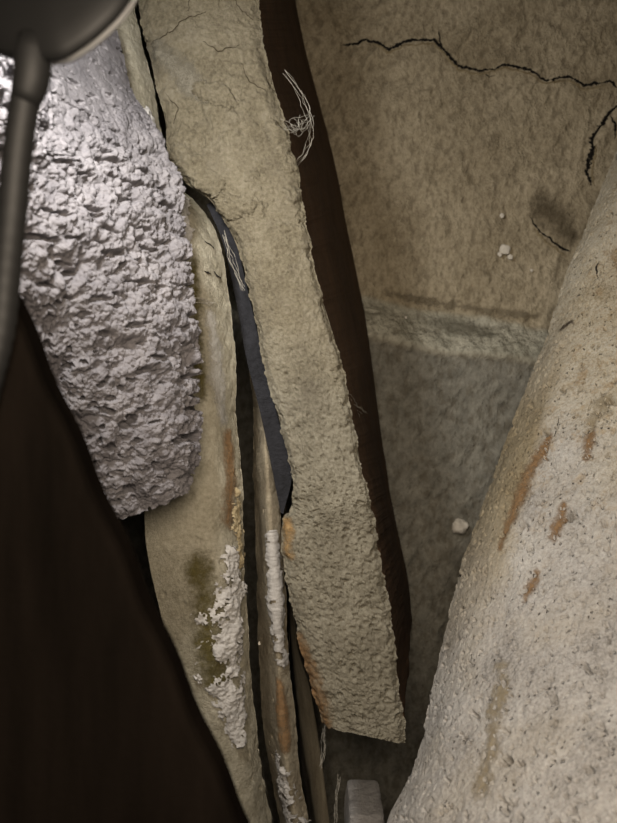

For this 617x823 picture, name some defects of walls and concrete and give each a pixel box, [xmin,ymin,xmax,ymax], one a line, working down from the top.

crack [341,31,617,186]
corrosion [498,435,552,550]
damp [185,554,229,686]